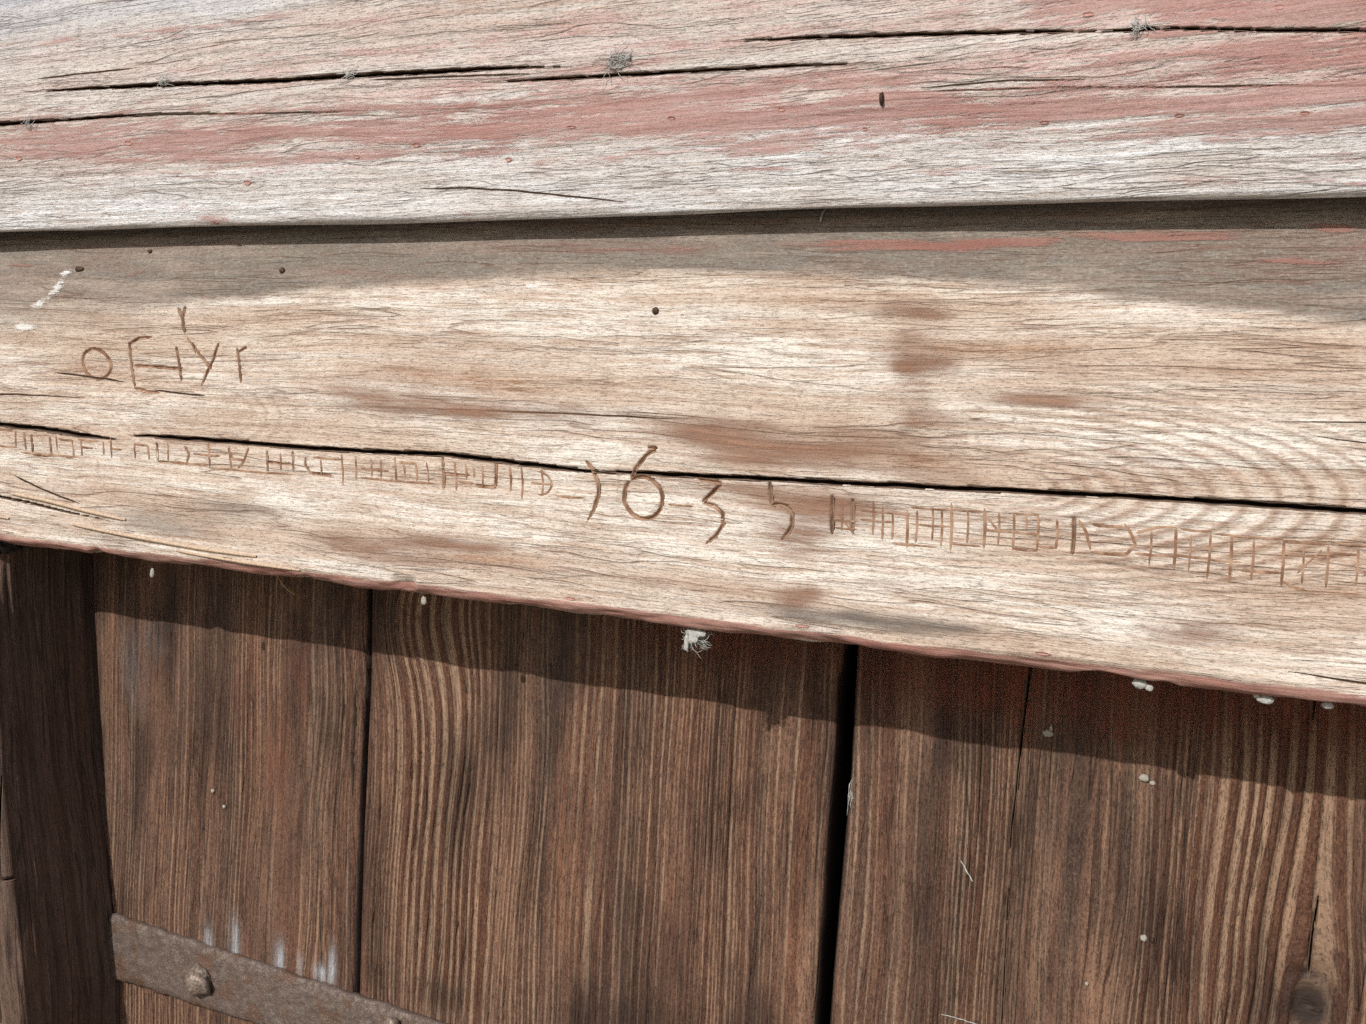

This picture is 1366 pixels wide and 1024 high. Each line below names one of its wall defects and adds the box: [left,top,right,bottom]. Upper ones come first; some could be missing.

crack [0,25,1366,127]
crack [0,372,1366,522]